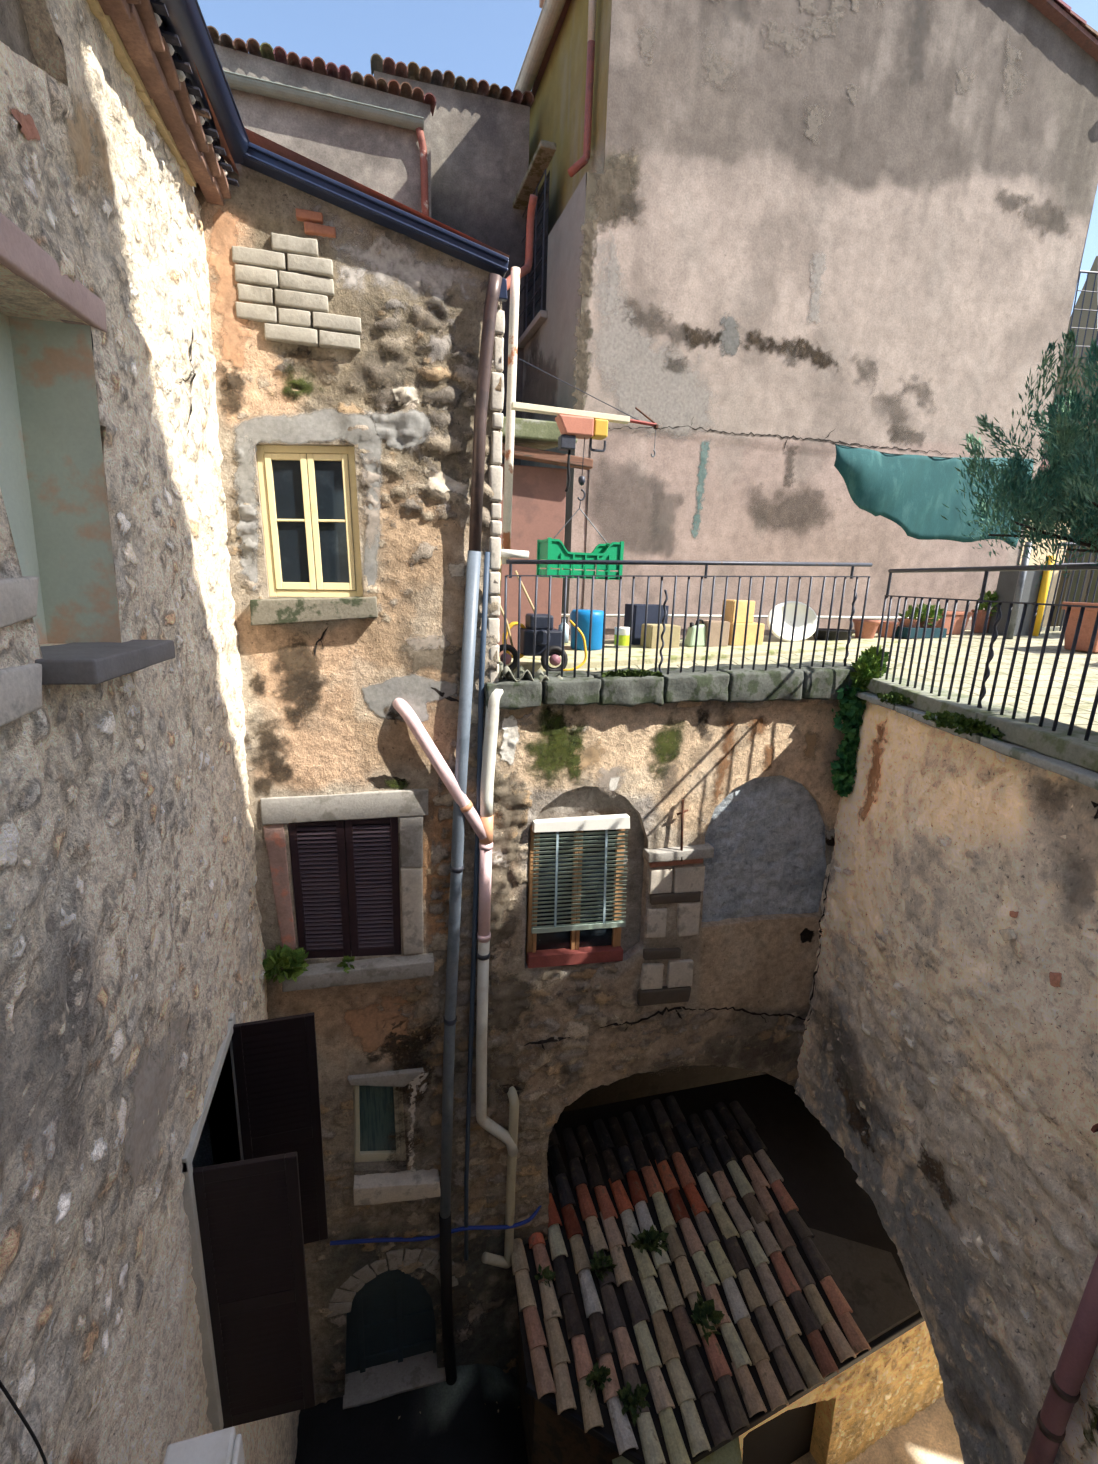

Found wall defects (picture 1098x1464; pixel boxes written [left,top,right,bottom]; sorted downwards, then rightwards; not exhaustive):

spalling [572,153,638,410]
leakage [595,241,722,538]
leakage [745,253,838,368]
leakage [281,707,299,728]
rust [859,724,886,821]
crack [524,873,830,1050]